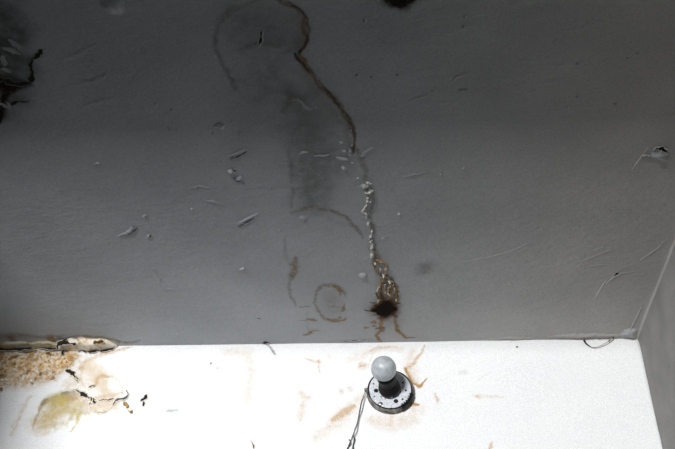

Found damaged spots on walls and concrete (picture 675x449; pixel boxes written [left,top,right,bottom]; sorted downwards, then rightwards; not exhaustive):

corrosion [364,278,414,342]
flaking render [0,337,117,391]